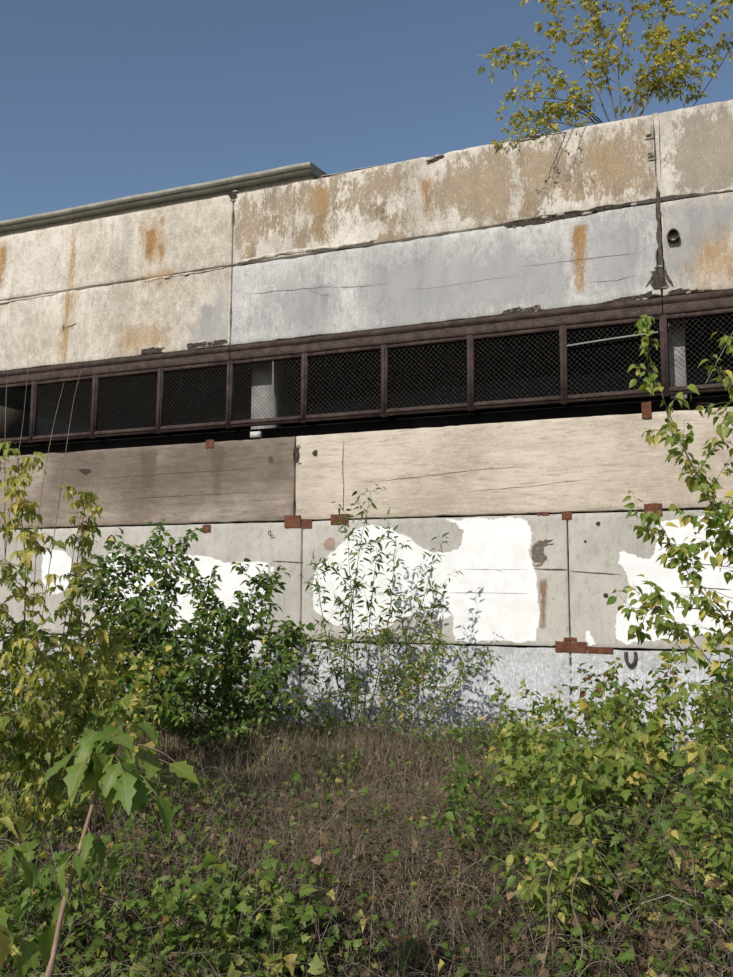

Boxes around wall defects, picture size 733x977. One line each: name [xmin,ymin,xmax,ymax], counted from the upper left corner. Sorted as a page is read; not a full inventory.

corrosion [145,218,164,257]
corrosion [573,226,585,291]
spalling [531,538,554,566]